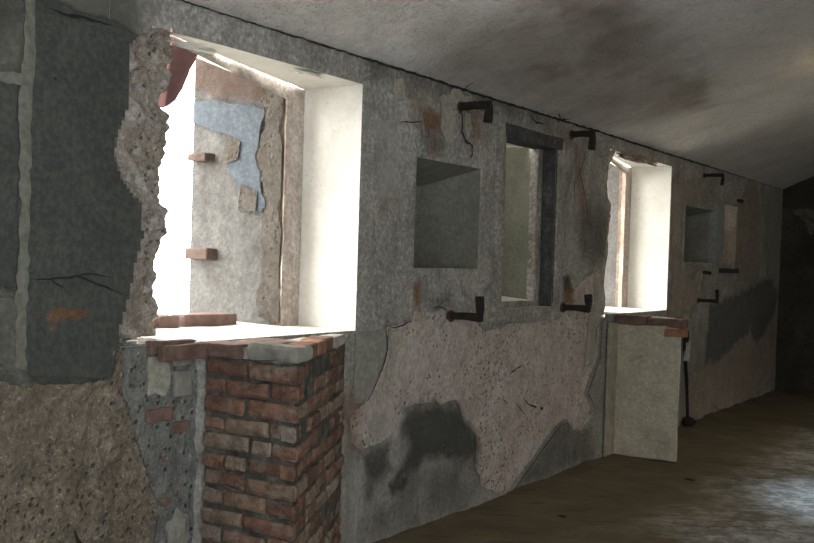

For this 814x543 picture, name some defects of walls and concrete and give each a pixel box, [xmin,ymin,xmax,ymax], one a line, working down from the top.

flaking render [166,40,283,323]
spalling [0,339,198,543]
water stain [367,450,387,479]
water stain [391,407,479,491]
spalling [350,272,601,492]
water stain [705,281,777,364]